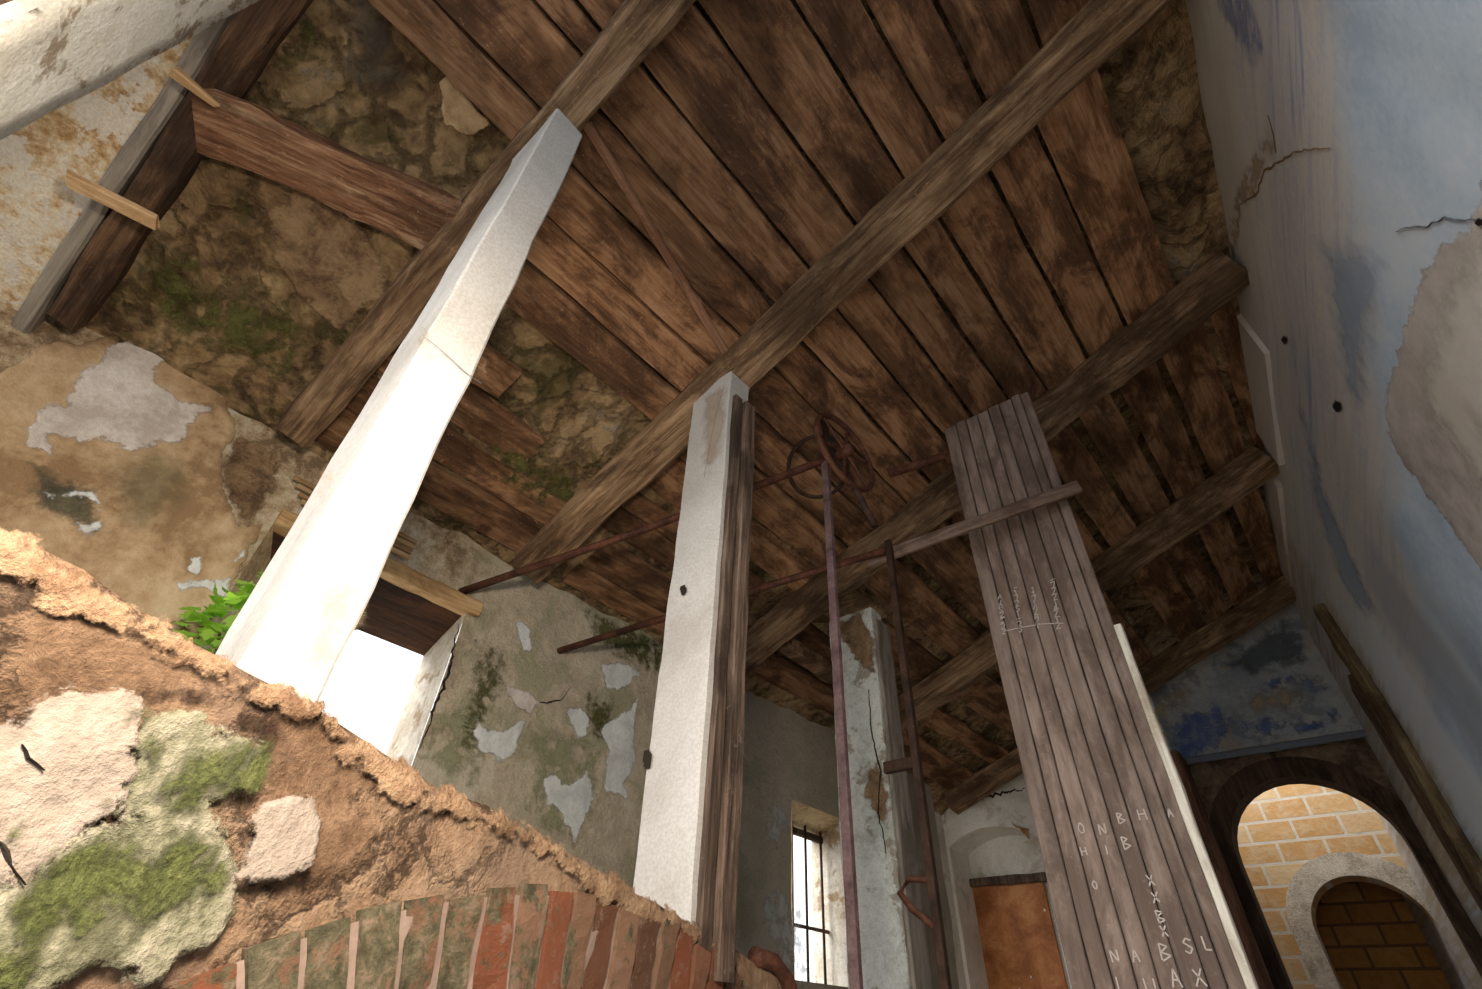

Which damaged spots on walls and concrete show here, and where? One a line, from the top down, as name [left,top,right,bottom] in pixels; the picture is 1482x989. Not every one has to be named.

peeling [1386,180,1482,570]
peeling [0,337,276,624]
peeling [0,687,322,989]
peeling [473,685,540,762]
peeling [543,662,652,842]
peeling [840,613,875,672]
peeling [864,760,889,821]